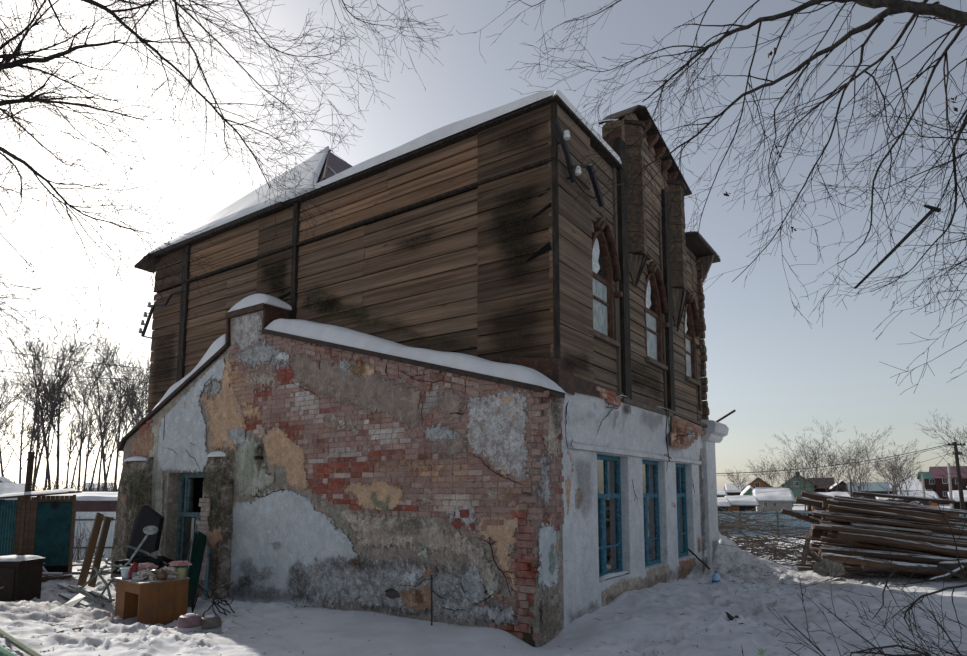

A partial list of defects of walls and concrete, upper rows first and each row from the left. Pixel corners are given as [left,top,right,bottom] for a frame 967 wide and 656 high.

flaking render [199,313,583,647]
flaking render [670,415,705,452]